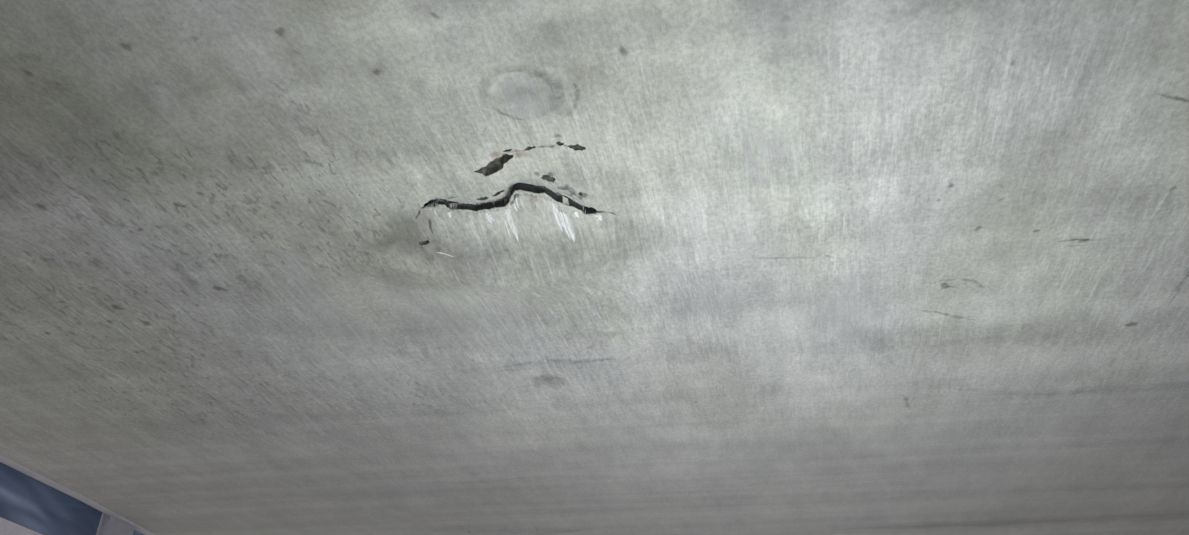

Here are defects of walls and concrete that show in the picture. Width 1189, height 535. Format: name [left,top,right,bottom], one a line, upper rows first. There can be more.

damp [485,194,519,242]
crack [419,183,613,233]
damp [551,200,579,242]